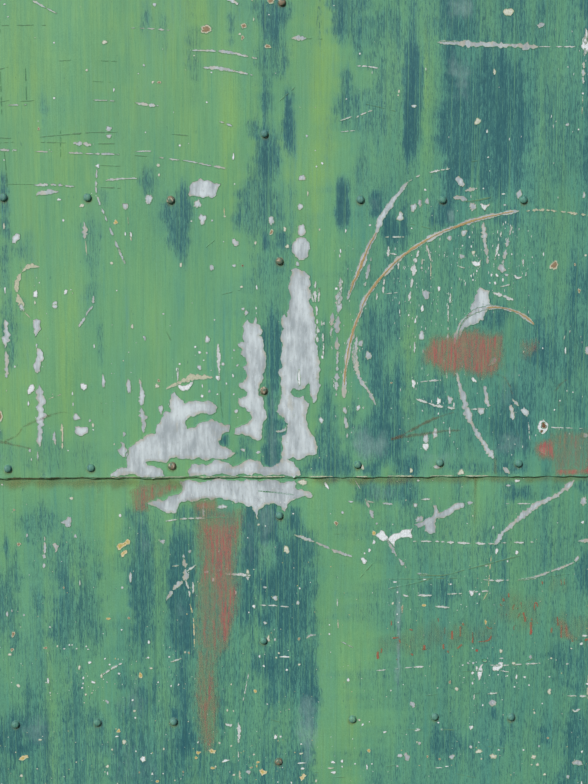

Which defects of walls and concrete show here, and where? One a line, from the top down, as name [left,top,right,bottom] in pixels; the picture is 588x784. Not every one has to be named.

peeling [110,168,588,522]
peeling [294,500,580,600]